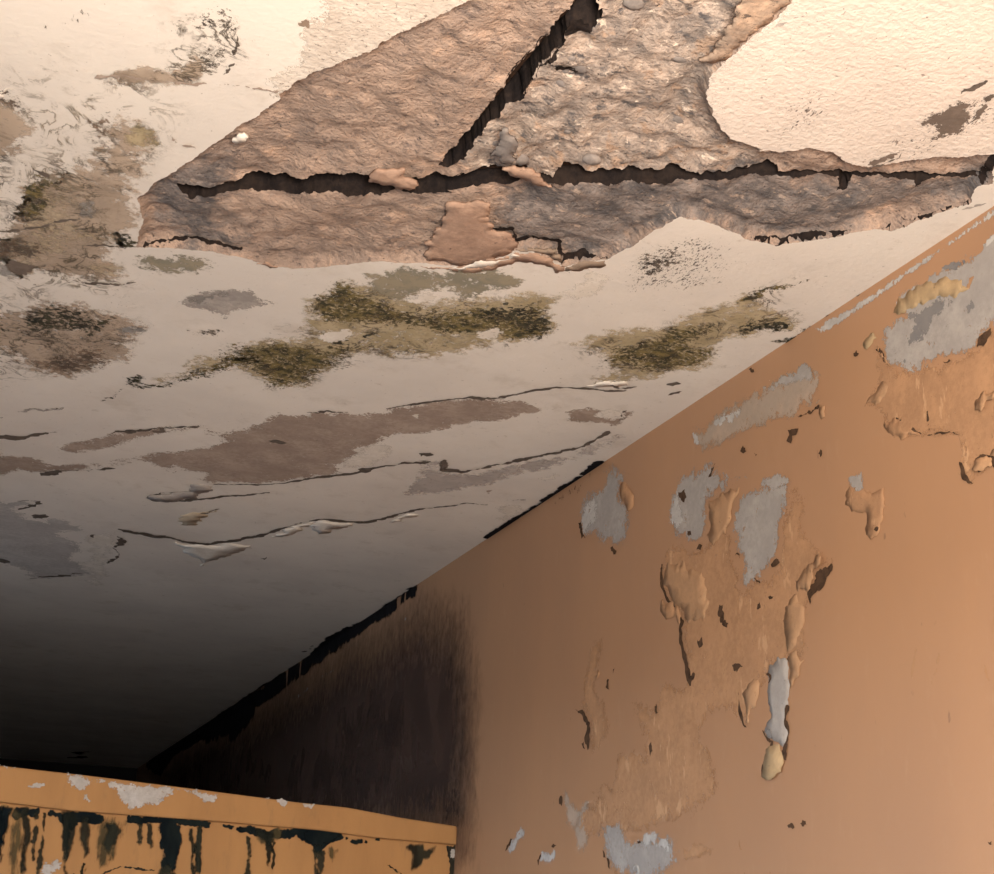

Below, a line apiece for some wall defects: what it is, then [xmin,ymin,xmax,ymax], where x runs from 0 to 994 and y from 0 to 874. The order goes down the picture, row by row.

water stain [0,88,211,378]
peeling [0,395,541,486]
water stain [102,266,607,401]
crack [118,431,611,566]
crack [493,226,608,264]
spalling [135,0,994,274]
crack [177,0,994,231]
crack [750,230,847,246]
peeling [853,235,994,484]
water stain [146,585,469,844]
peeling [559,363,833,874]
water stain [0,806,211,874]